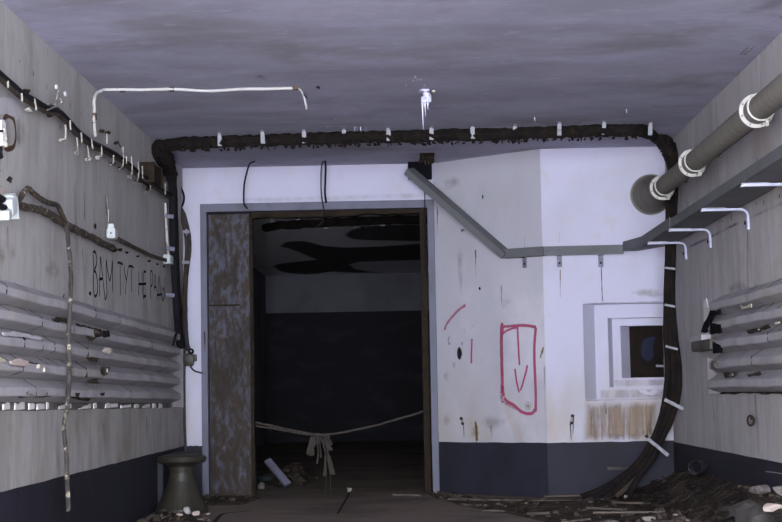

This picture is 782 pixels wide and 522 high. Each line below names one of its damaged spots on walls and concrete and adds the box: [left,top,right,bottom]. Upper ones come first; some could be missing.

corrosion [588,405,653,437]